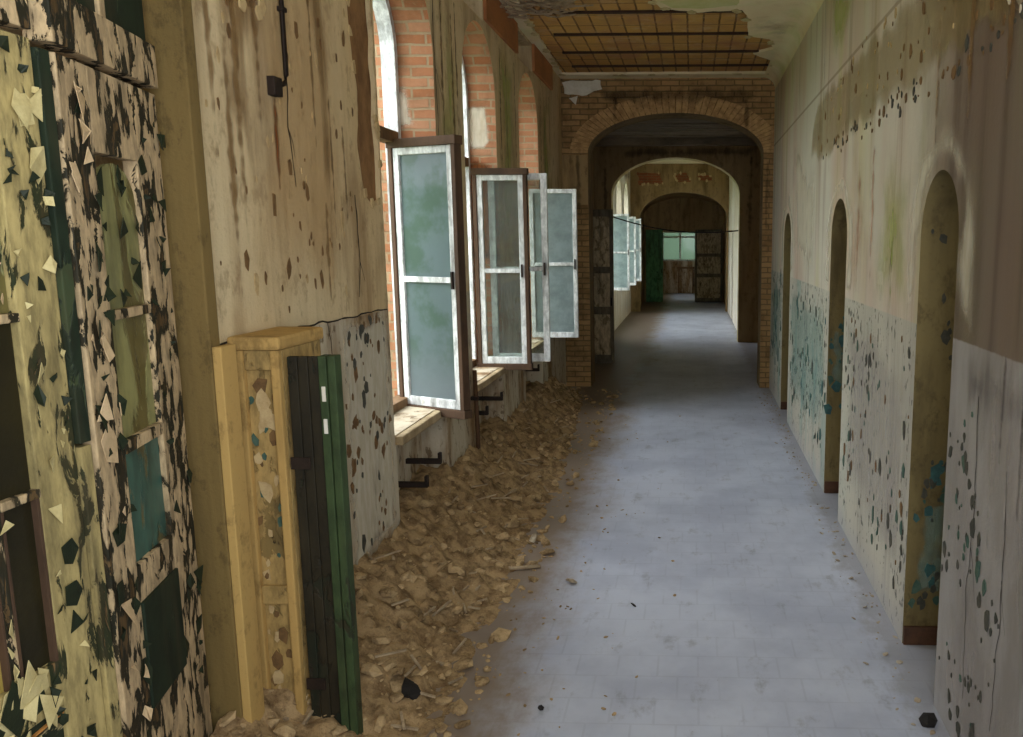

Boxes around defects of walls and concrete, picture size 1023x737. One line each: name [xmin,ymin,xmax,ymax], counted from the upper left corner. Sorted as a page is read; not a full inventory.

peeling [11,86,43,128]
peeling [3,138,55,225]
peeling [69,81,107,231]
water stain [224,0,257,220]
water stain [307,0,324,119]
flaking render [500,0,774,76]
peeling [20,255,57,291]
peeling [87,241,142,362]
peeling [95,374,128,463]
peeling [770,272,999,643]
peeling [58,580,89,633]
peeling [0,619,69,737]